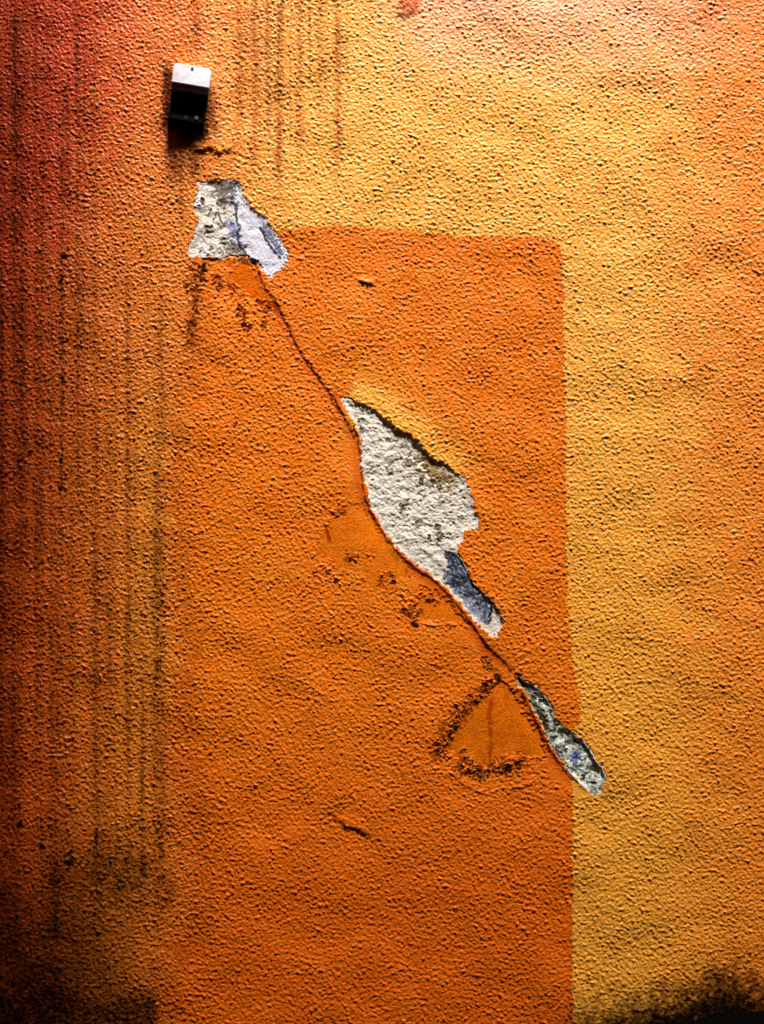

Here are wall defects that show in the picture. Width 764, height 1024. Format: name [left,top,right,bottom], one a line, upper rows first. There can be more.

spalling [188,179,289,328]
crack [248,258,374,515]
spalling [313,397,504,637]
peeling [433,655,606,797]